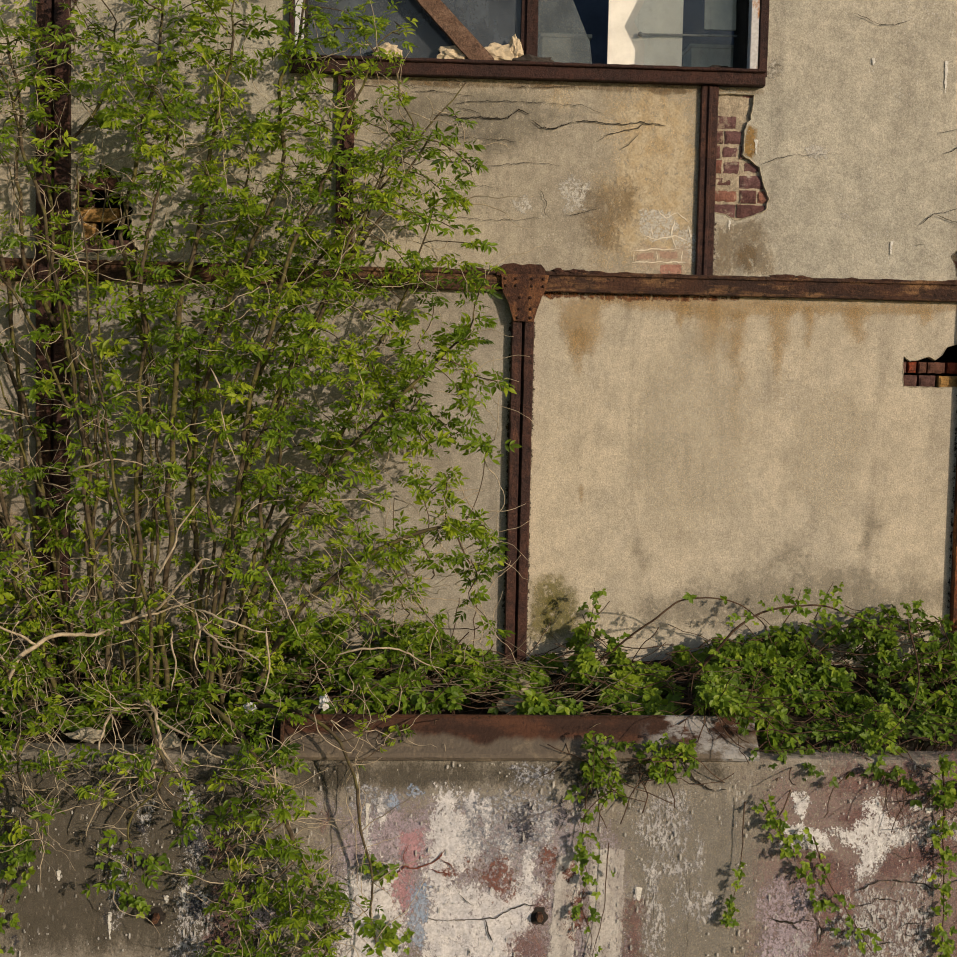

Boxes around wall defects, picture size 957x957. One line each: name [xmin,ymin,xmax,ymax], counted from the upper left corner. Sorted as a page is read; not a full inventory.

crack [381,84,665,189]
leakage [558,175,590,213]
leakage [598,86,699,263]
flaking render [715,93,770,221]
spalling [902,344,957,389]
rust [501,400,510,656]
rust [947,410,957,608]
peeling [326,761,590,957]
peeling [632,790,696,881]
peeling [681,889,730,929]
peeling [745,752,957,957]